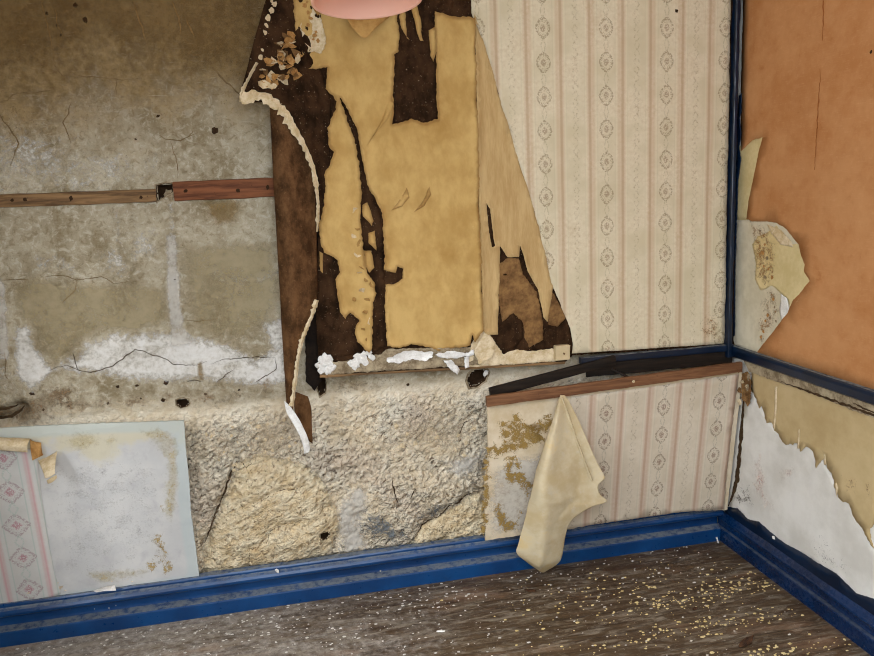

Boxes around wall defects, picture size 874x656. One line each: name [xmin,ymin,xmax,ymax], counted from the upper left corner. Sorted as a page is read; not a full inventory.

peeling [298,0,326,54]
crack [0,89,55,166]
peeling [315,0,573,398]
leakage [16,246,285,387]
crack [51,349,277,383]
peeling [733,220,809,352]
peeling [0,437,57,484]
crack [205,461,252,542]
spalling [204,422,339,573]
spalling [409,492,485,544]
leakage [453,413,553,536]
peeling [730,372,874,598]